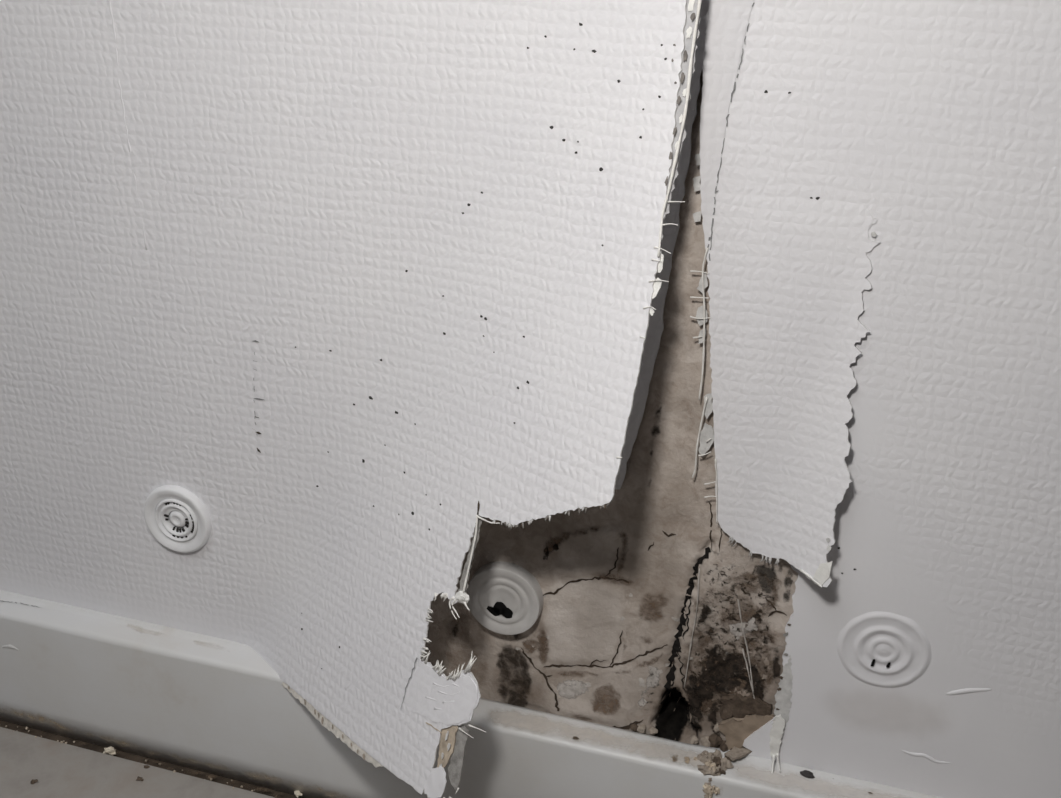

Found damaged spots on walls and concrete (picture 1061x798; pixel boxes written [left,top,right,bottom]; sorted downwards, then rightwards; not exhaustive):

flaking render [422,66,798,752]
crack [521,502,722,730]
leakage [685,564,792,736]
leakage [635,743,727,798]